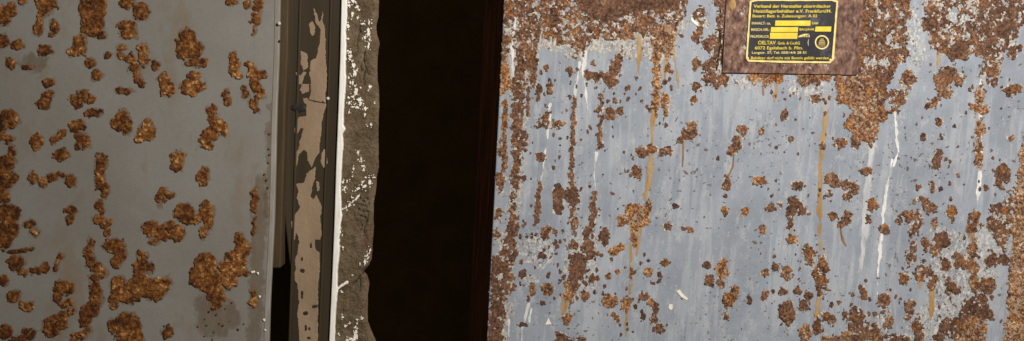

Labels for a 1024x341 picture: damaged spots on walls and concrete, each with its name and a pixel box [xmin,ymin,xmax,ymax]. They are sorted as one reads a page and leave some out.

rust [0,0,215,341]
rust [189,148,271,340]
rust [198,50,268,150]
rust [226,0,264,35]
peeling [291,8,328,341]
rust [487,0,736,341]
rust [702,0,1024,341]